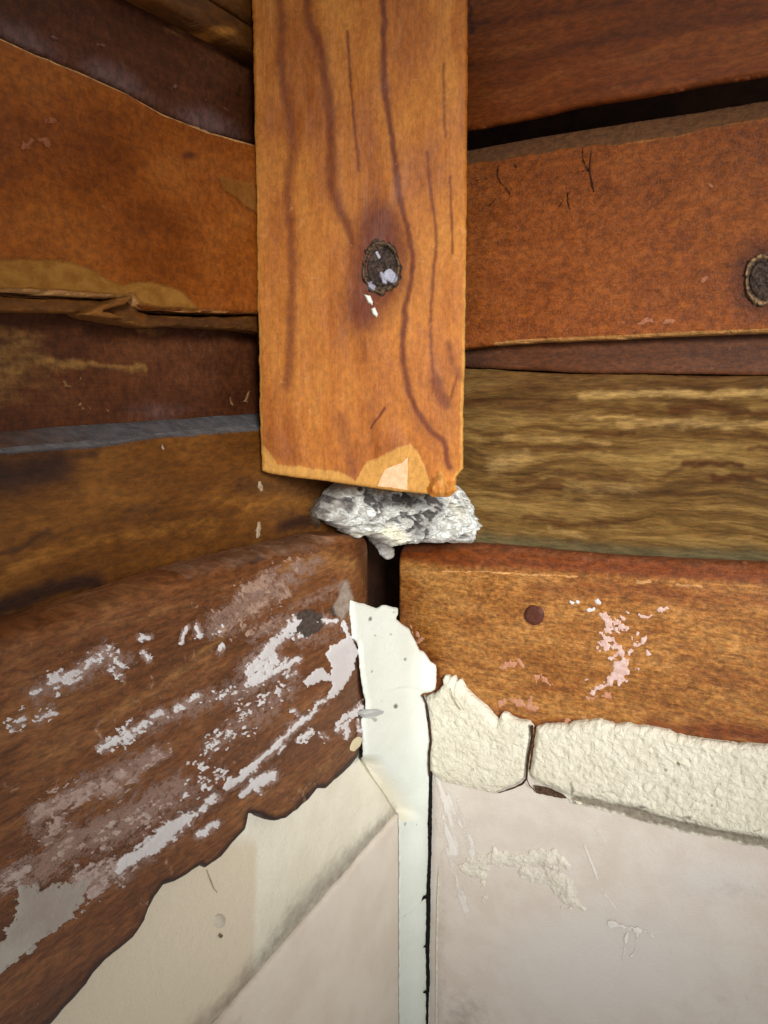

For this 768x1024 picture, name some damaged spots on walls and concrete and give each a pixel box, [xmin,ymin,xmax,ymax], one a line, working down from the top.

peeling [497,696,539,712]
peeling [499,658,553,687]
peeling [569,598,669,701]
peeling [0,556,384,974]
crack [498,725,534,793]
spalling [534,785,582,805]